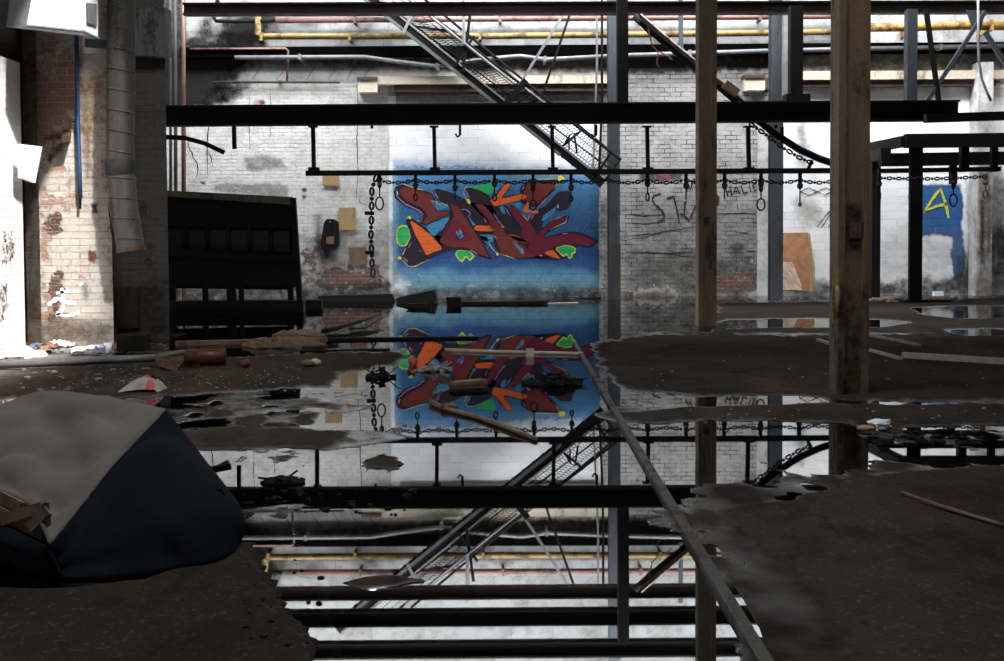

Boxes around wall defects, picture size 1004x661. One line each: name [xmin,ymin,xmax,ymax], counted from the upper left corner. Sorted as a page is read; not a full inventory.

flaking render [43,211,63,235]
flaking render [48,270,65,321]
flaking render [301,245,384,288]
flaking render [717,269,757,292]